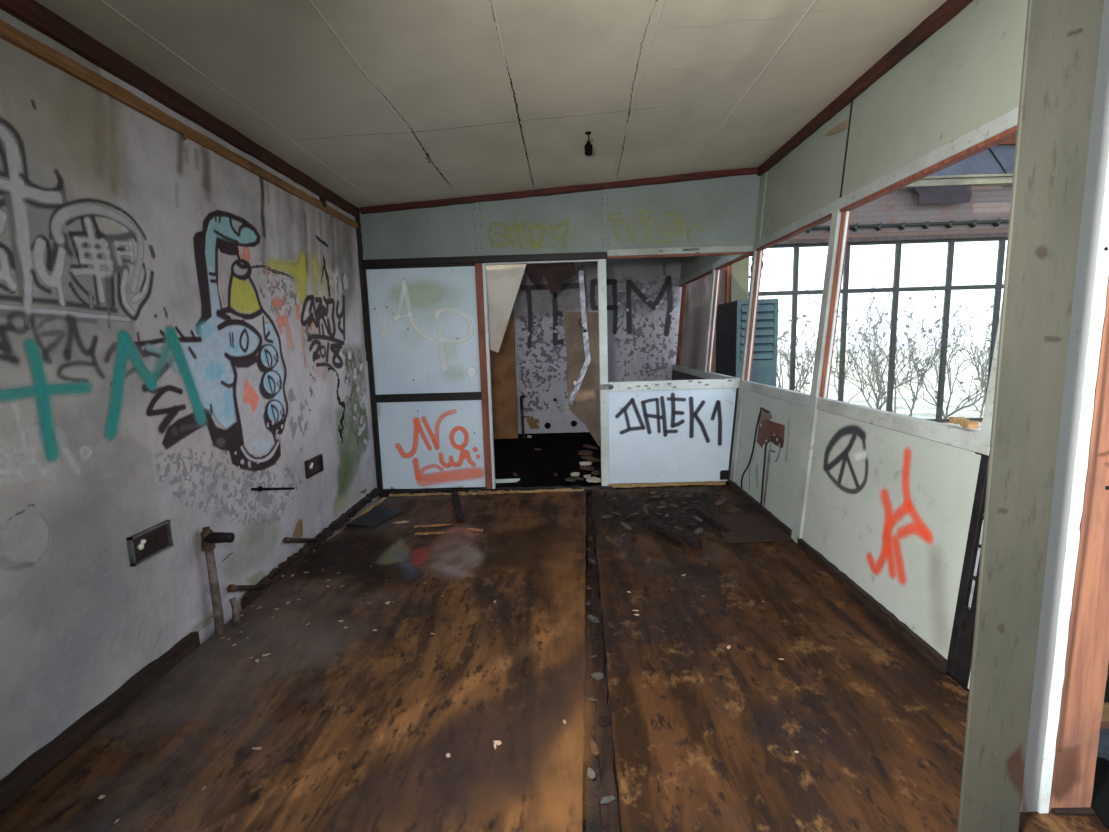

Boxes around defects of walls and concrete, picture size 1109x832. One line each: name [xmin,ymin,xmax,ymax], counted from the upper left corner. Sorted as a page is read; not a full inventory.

crack [305,0,677,187]
peeling [516,314,569,429]